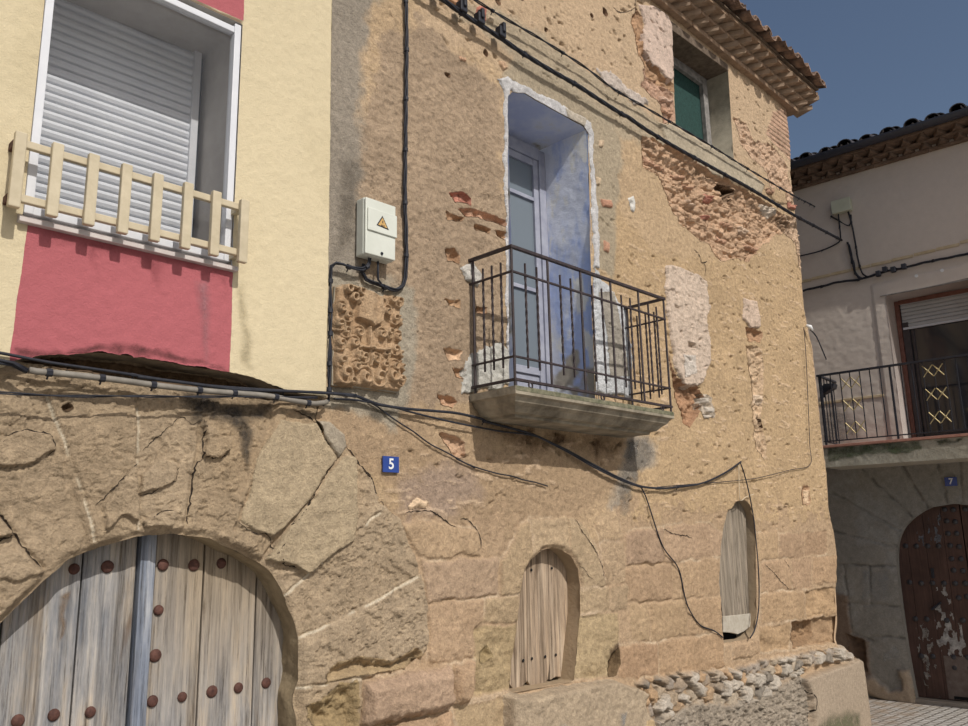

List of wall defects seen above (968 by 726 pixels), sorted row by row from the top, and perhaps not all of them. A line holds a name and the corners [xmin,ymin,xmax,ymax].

peeling [596,4,675,124]
peeling [437,61,632,408]
spalling [641,118,801,270]
peeling [664,265,716,428]
spalling [742,298,767,459]
crack [97,417,230,524]
damp [621,440,651,504]